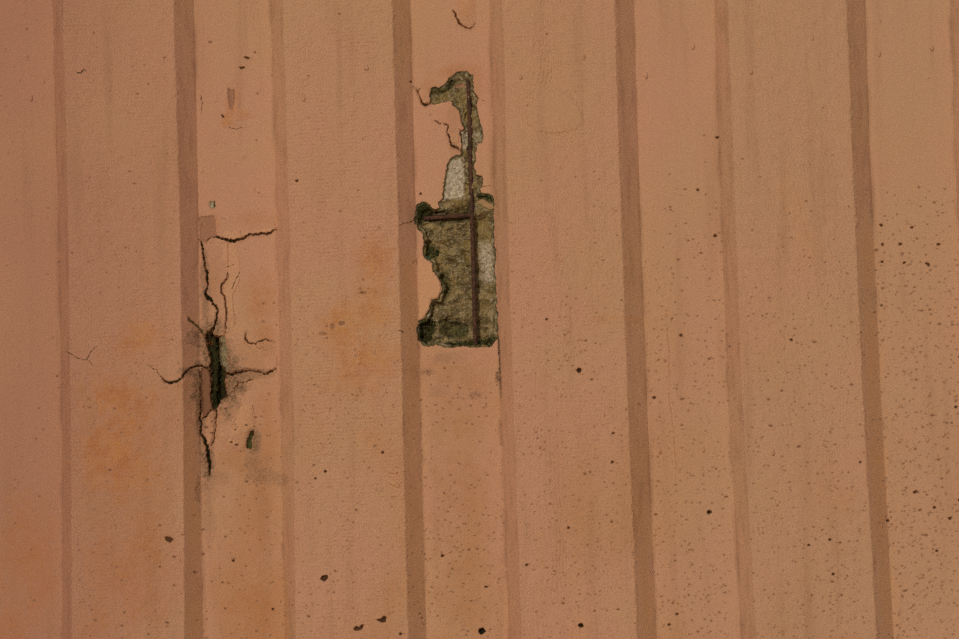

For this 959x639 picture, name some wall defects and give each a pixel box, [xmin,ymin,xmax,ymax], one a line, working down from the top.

rust [417,50,488,134]
spalling [414,71,498,348]
crack [148,229,277,475]